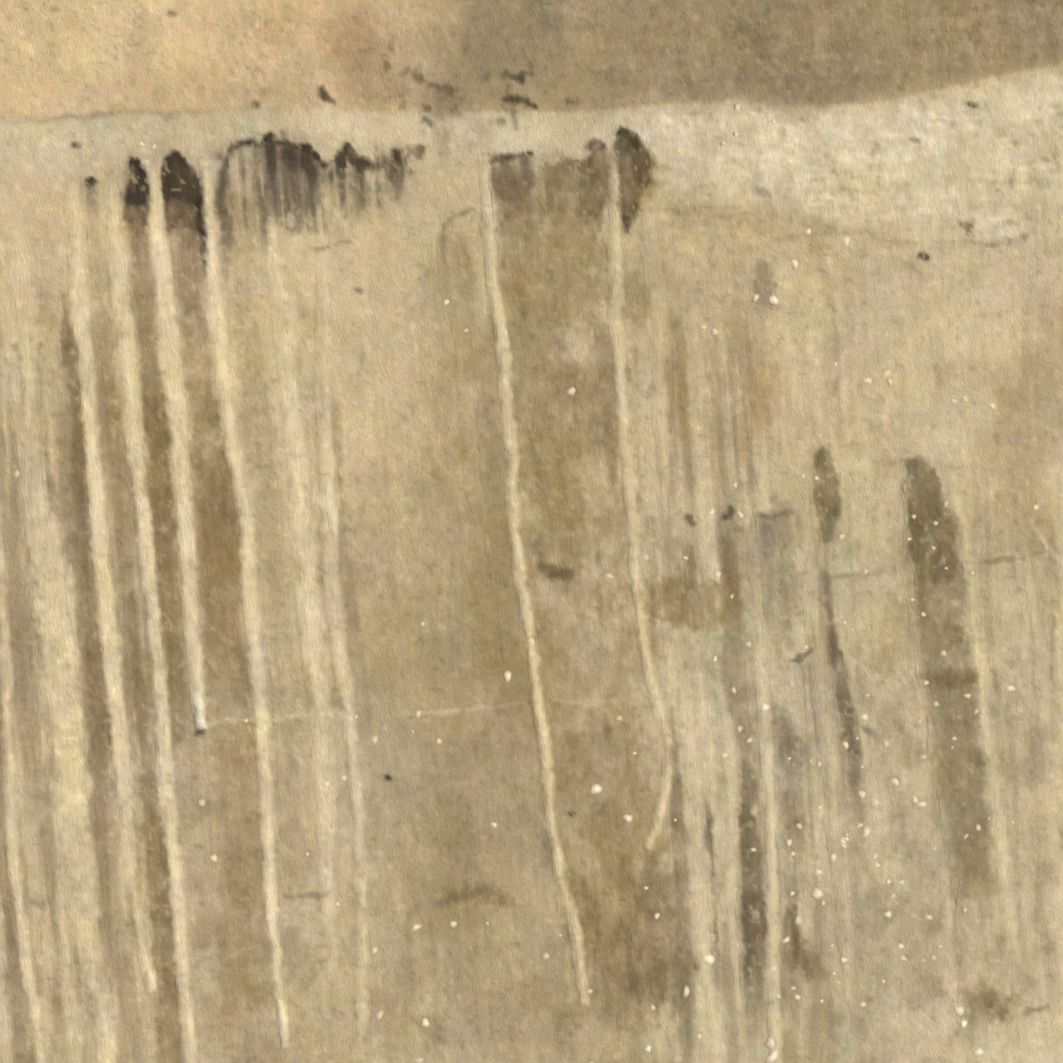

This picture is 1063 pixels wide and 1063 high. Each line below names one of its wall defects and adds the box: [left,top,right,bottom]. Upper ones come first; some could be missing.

leakage [0,121,422,1063]
leakage [429,122,887,1063]
leakage [898,450,1027,1063]